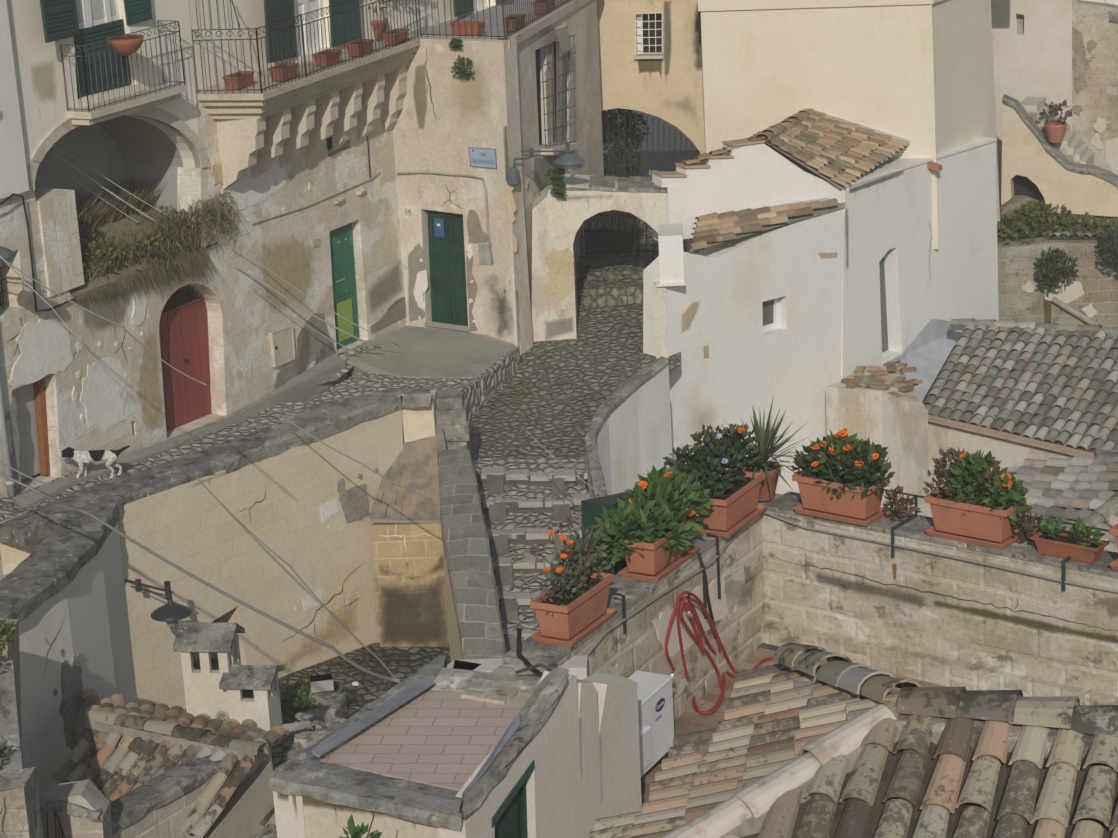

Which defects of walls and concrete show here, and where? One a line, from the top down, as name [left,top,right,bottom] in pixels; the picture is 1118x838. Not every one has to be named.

crack [425,48,436,122]
flaking render [211,156,305,210]
flaking render [131,290,147,337]
flaking render [6,317,133,494]
crack [283,566,361,642]
crack [772,556,1117,631]